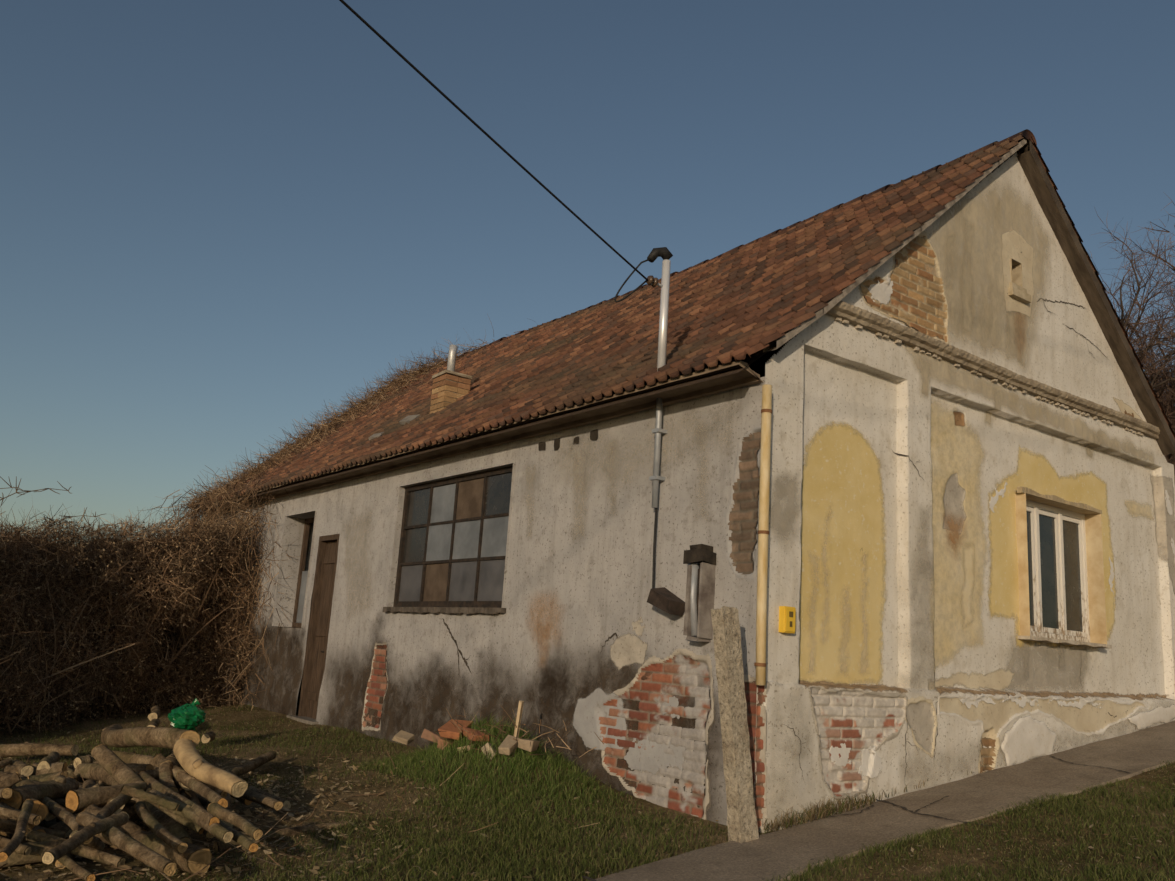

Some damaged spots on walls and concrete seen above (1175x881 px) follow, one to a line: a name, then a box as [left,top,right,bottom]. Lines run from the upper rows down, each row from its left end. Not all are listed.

flaking render [859,231,949,344]
crack [1036,298,1106,357]
spalling [724,425,761,581]
spalling [943,473,966,546]
flaking render [362,642,388,731]
spalling [392,729,473,752]
crack [442,618,471,673]
water stain [328,657,721,818]
flaking render [599,617,715,820]
flaking render [744,675,770,833]
flaking render [799,681,1172,800]